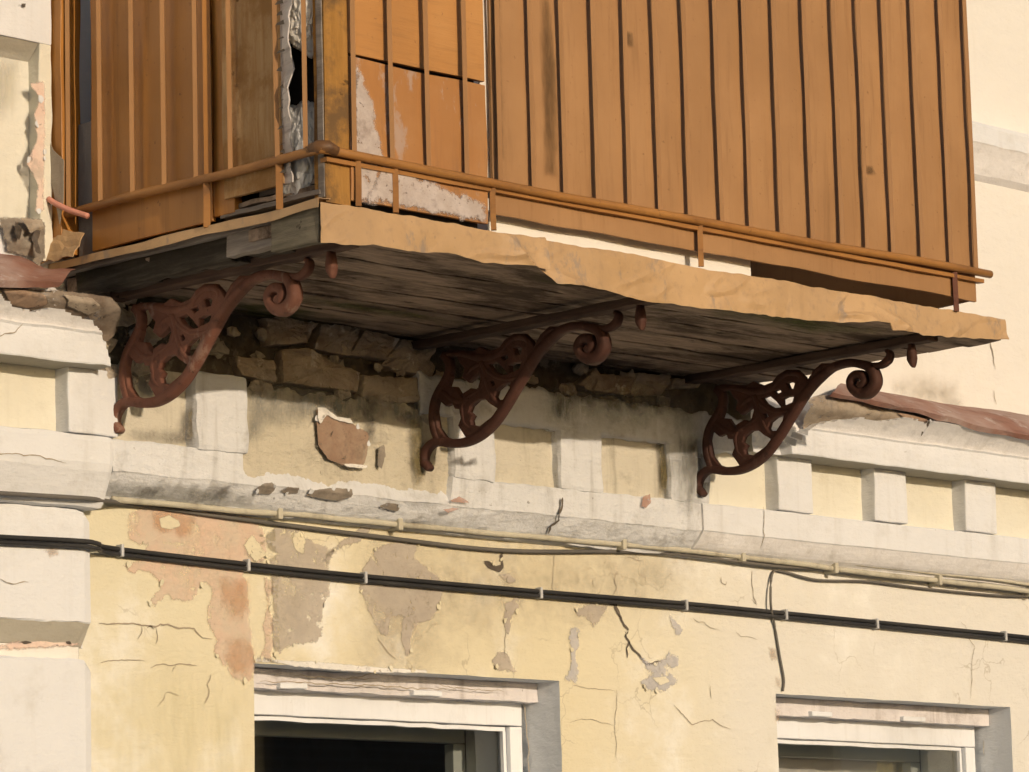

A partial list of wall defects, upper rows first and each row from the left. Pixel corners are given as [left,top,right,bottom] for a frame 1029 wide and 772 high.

flaking render [0,287,162,393]
flaking render [209,316,449,511]
flaking render [559,362,700,406]
leakage [658,443,667,489]
leakage [678,399,703,495]
crack [99,623,211,706]
peeling [126,509,427,684]
peeling [360,542,442,654]
peeling [492,651,515,672]
peeling [565,603,607,683]
crack [548,497,662,665]